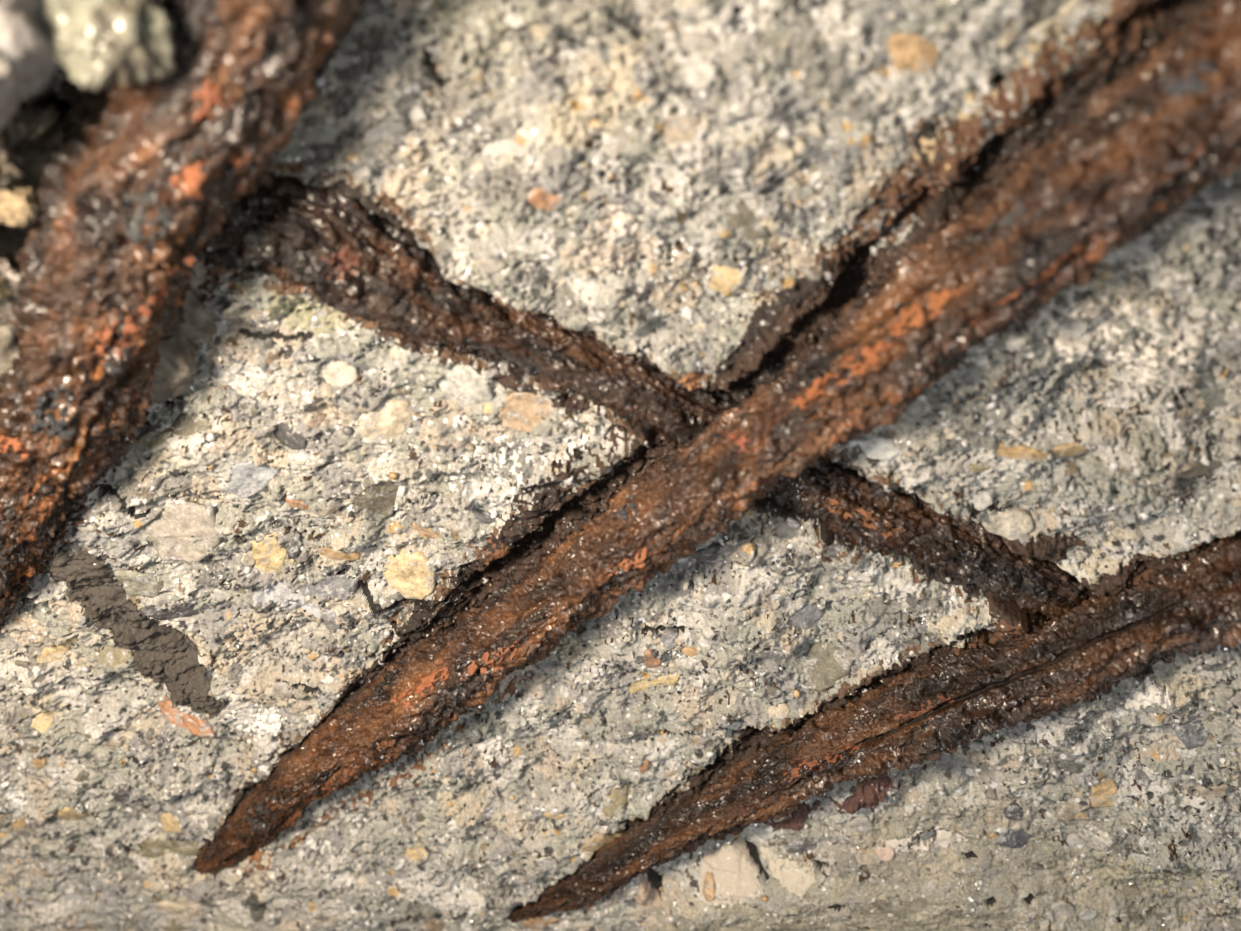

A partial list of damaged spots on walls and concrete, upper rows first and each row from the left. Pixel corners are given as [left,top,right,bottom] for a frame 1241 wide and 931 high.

spalling [1031,283,1202,386]
corrosion [175,395,252,436]
corrosion [1041,408,1091,443]
spalling [449,428,590,525]
corrosion [221,510,250,561]
corrosion [348,562,381,588]
spalling [1056,559,1091,585]
peeling [47,547,282,741]
spalling [940,592,992,648]
spalling [1124,677,1171,716]
corrosion [483,743,533,795]
corrosion [1167,827,1201,876]